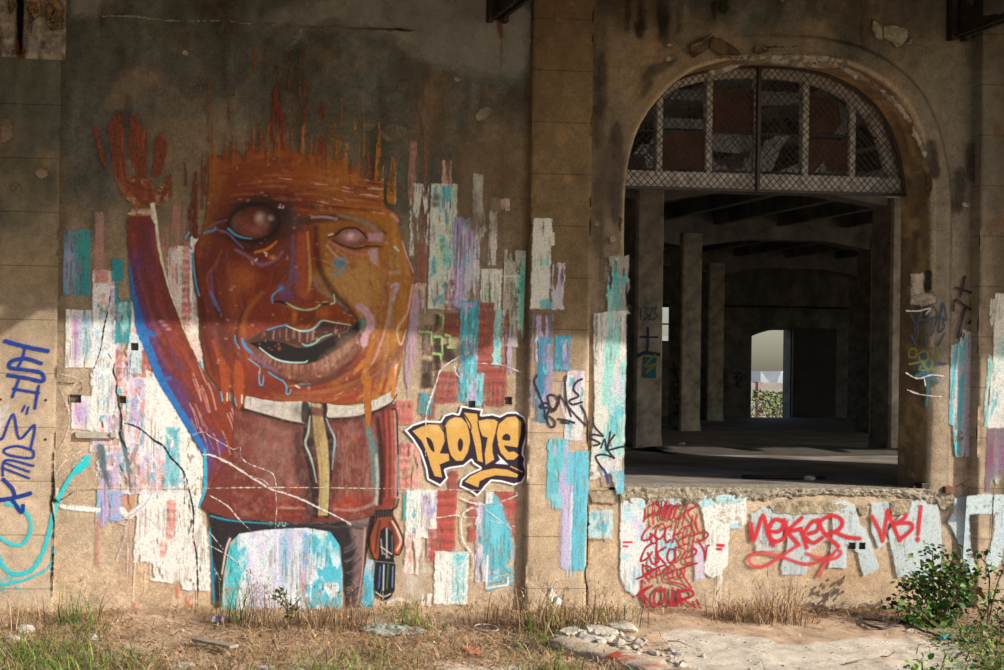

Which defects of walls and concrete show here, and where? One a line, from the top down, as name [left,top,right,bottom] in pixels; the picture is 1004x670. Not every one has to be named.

spalling [872,19,914,48]
peeling [689,36,927,159]
crack [50,296,509,607]